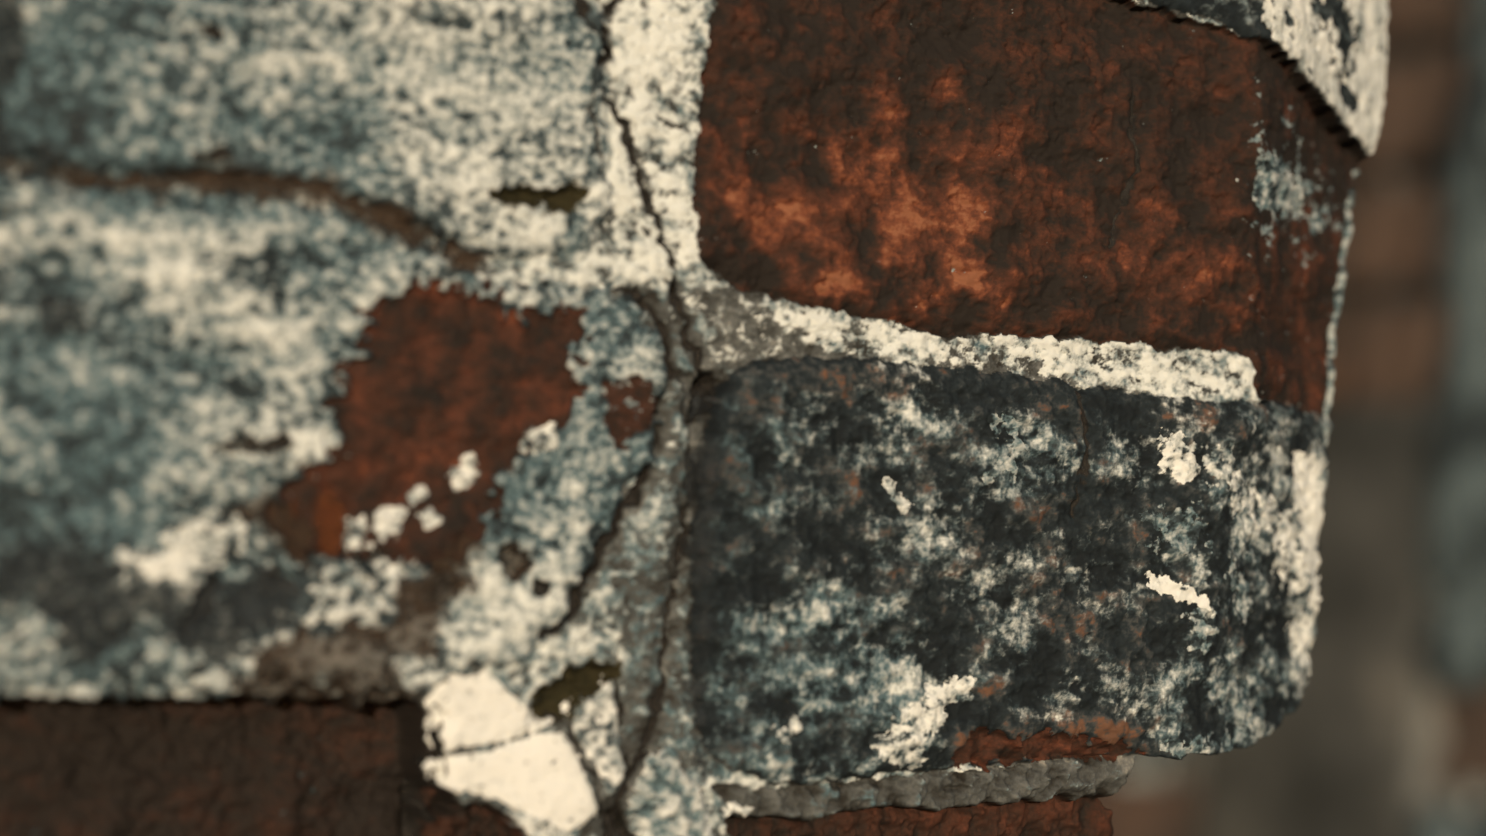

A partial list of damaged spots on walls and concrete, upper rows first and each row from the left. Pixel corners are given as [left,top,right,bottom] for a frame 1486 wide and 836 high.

damp [0,0,87,168]
damp [33,296,89,337]
damp [0,490,486,713]
spalling [114,275,659,629]
crack [399,0,715,836]
damp [676,393,722,776]